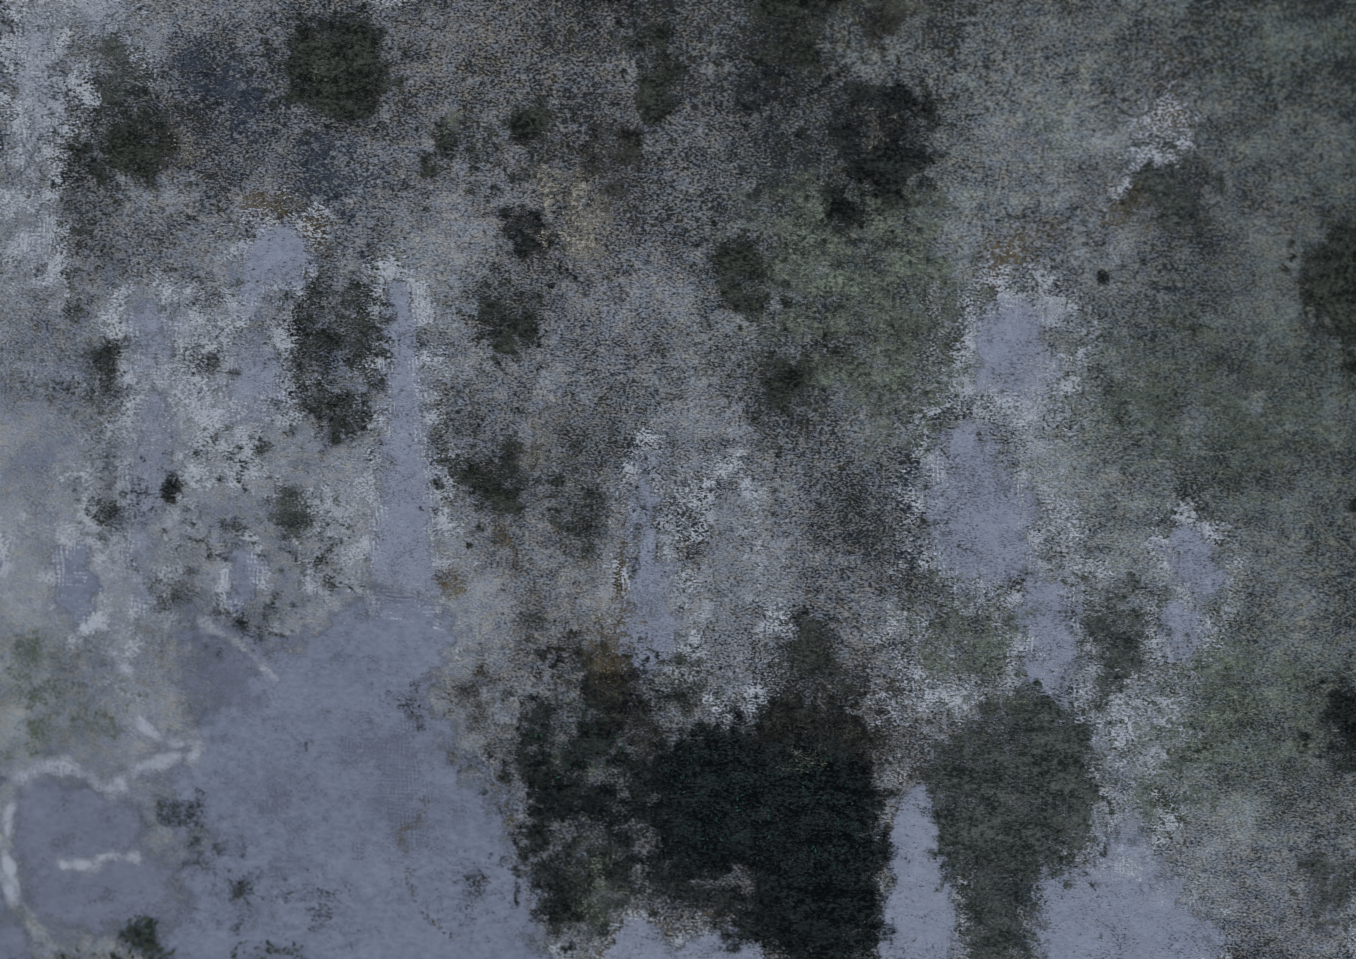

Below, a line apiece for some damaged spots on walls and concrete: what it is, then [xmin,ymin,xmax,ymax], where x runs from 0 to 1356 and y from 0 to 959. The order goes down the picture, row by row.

water stain [0,16,403,959]
water stain [248,0,970,466]
water stain [386,283,1190,959]
water stain [1279,206,1356,406]
crack [0,797,37,919]
crack [56,850,142,878]